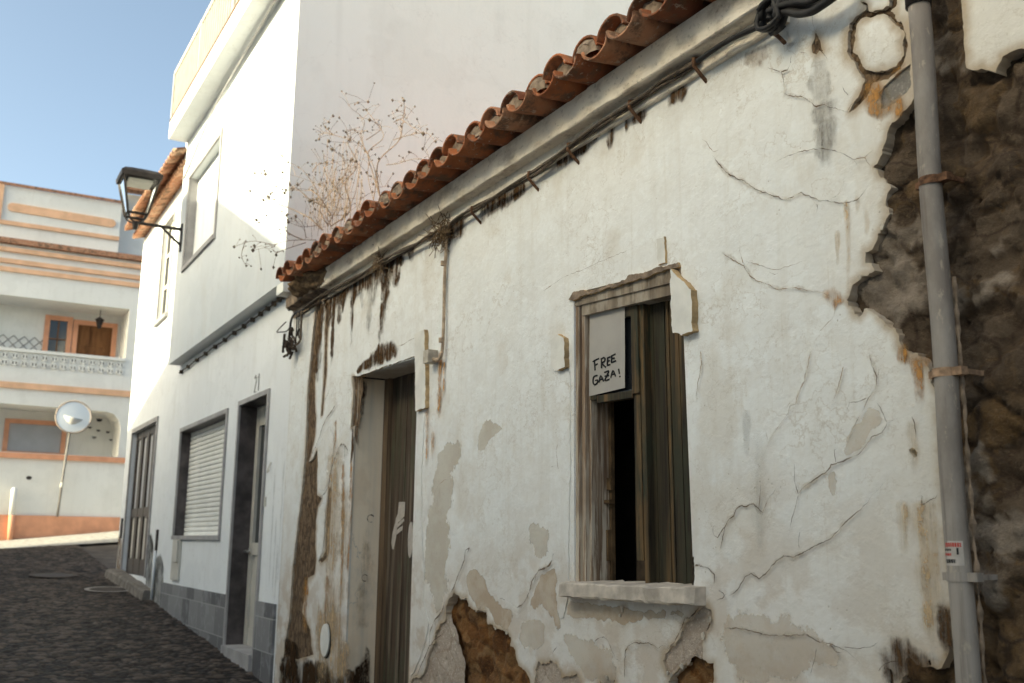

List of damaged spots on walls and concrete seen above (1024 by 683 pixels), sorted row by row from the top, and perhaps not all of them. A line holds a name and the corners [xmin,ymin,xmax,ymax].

water stain [315,248,414,463]
crack [725,255,835,331]
crack [708,145,864,208]
rust [866,82,903,118]
spalling [856,109,933,366]
rust [899,347,927,390]
spalling [931,0,1024,683]
spalling [411,364,581,683]
spalling [529,334,714,683]
crack [595,359,898,675]
water stain [279,605,370,683]
spalling [907,659,956,683]